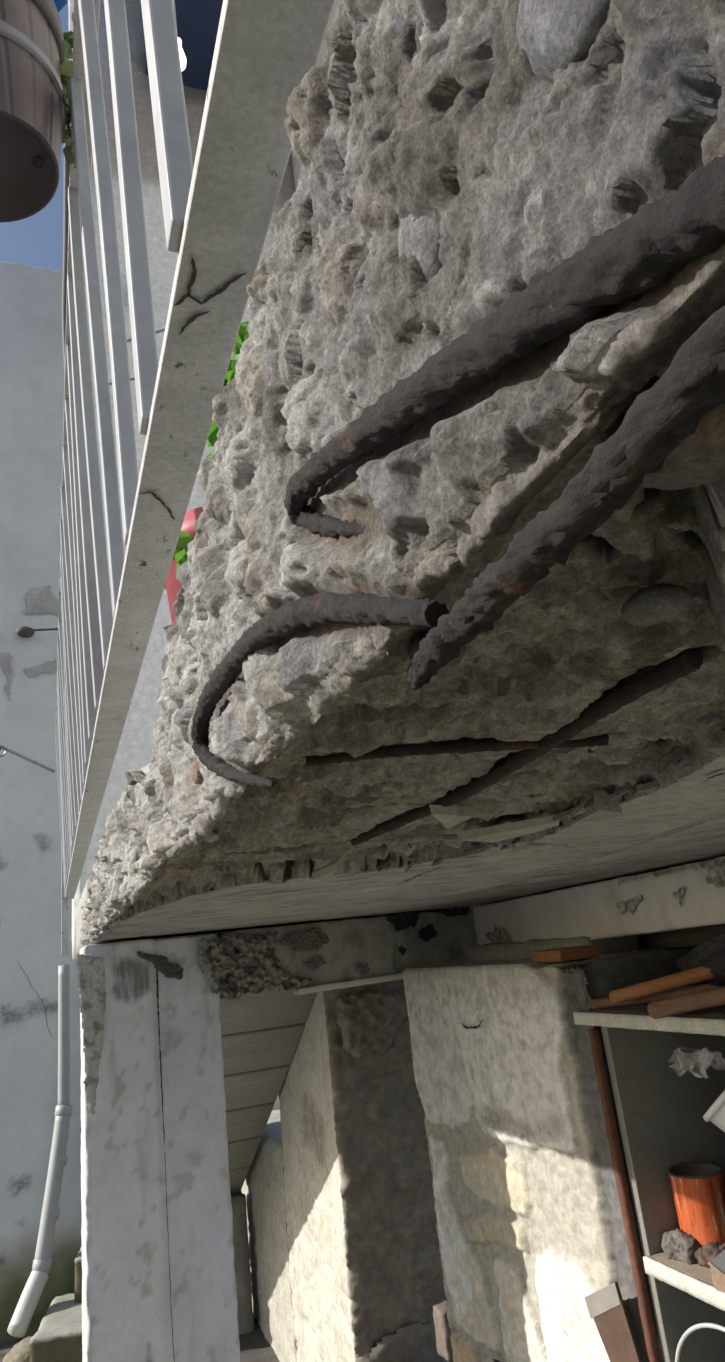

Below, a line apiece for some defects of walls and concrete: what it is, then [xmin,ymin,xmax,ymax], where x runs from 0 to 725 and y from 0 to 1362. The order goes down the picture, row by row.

corrosion [598,141,725,236]
corrosion [263,243,725,617]
spalling [76,0,725,1115]
peeling [22,585,59,615]
corrosion [271,623,406,655]
corrosion [208,672,244,743]
crack [584,645,718,709]
corrosion [207,752,282,788]
crack [574,732,669,758]
crack [220,737,549,885]